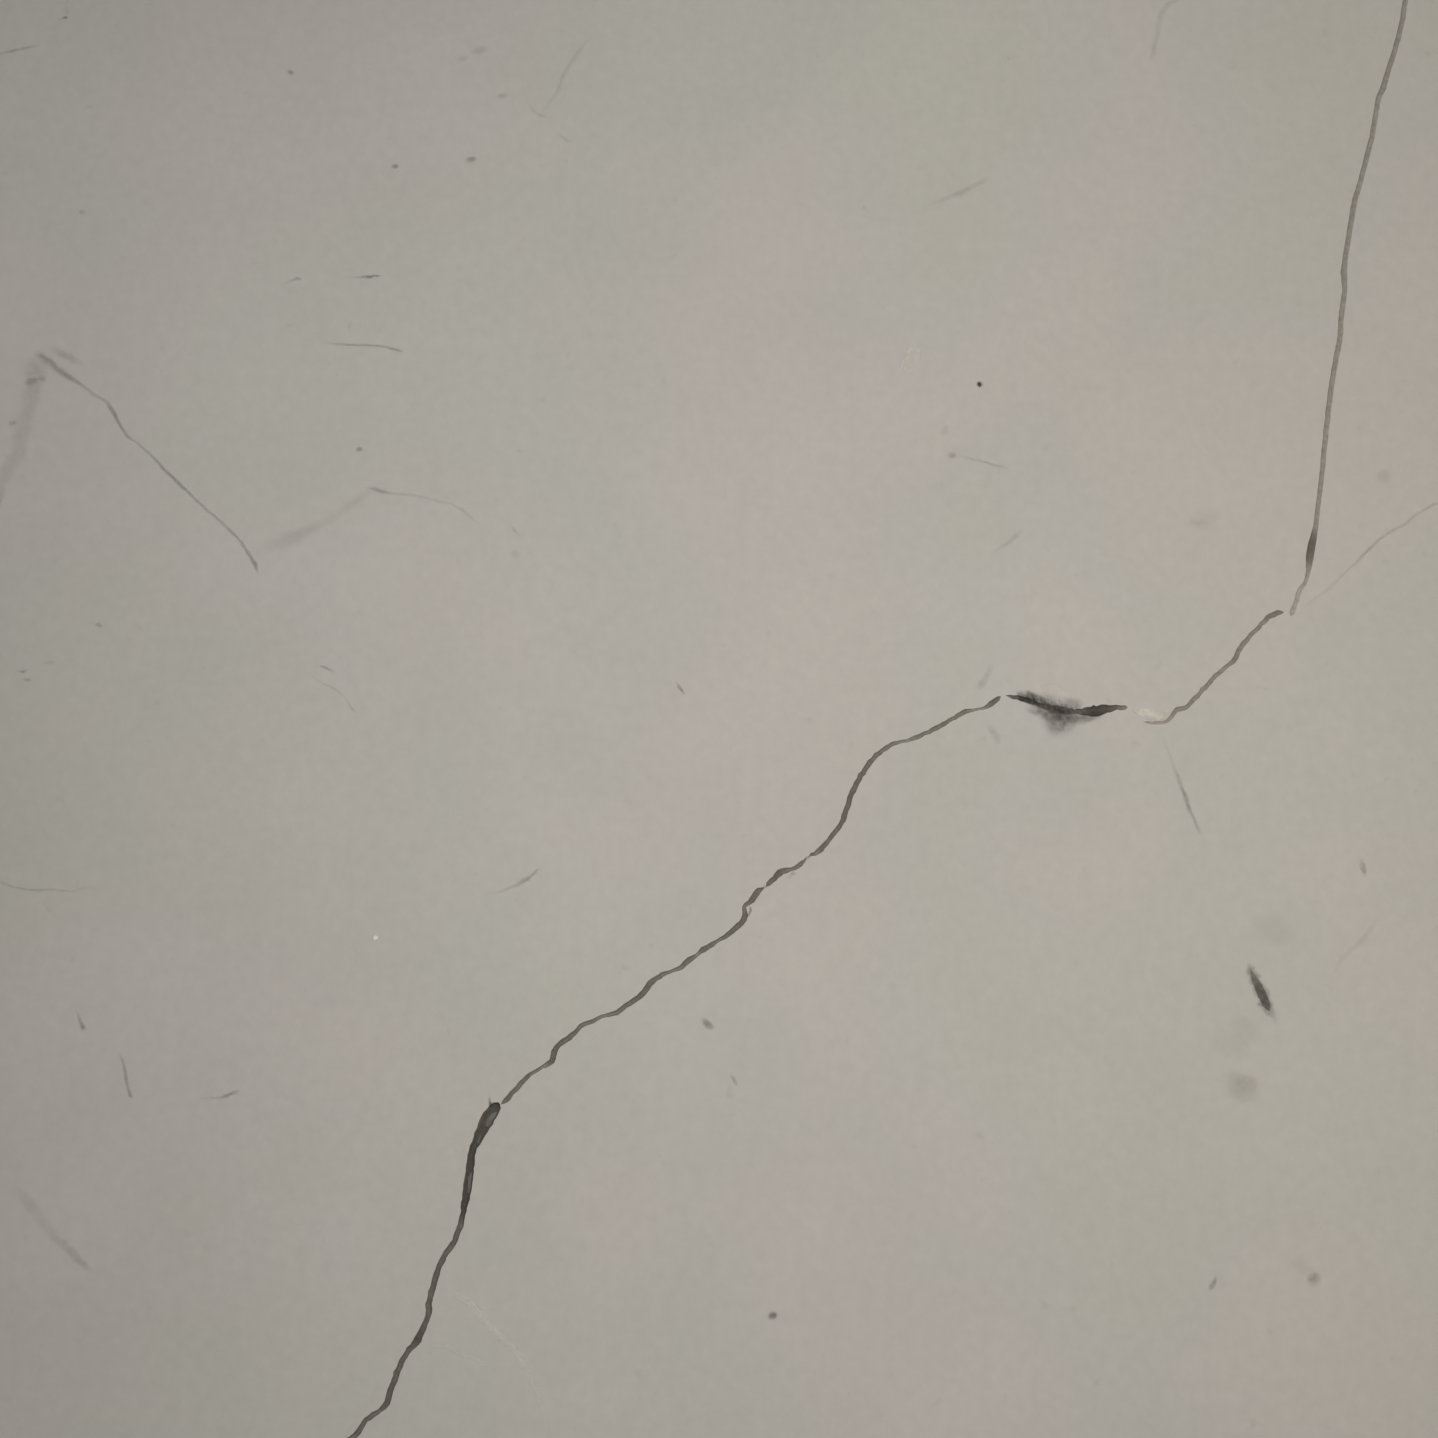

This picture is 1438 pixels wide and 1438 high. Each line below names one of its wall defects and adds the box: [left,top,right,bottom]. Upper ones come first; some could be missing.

crack [1133,0,1408,725]
crack [348,696,1001,1438]